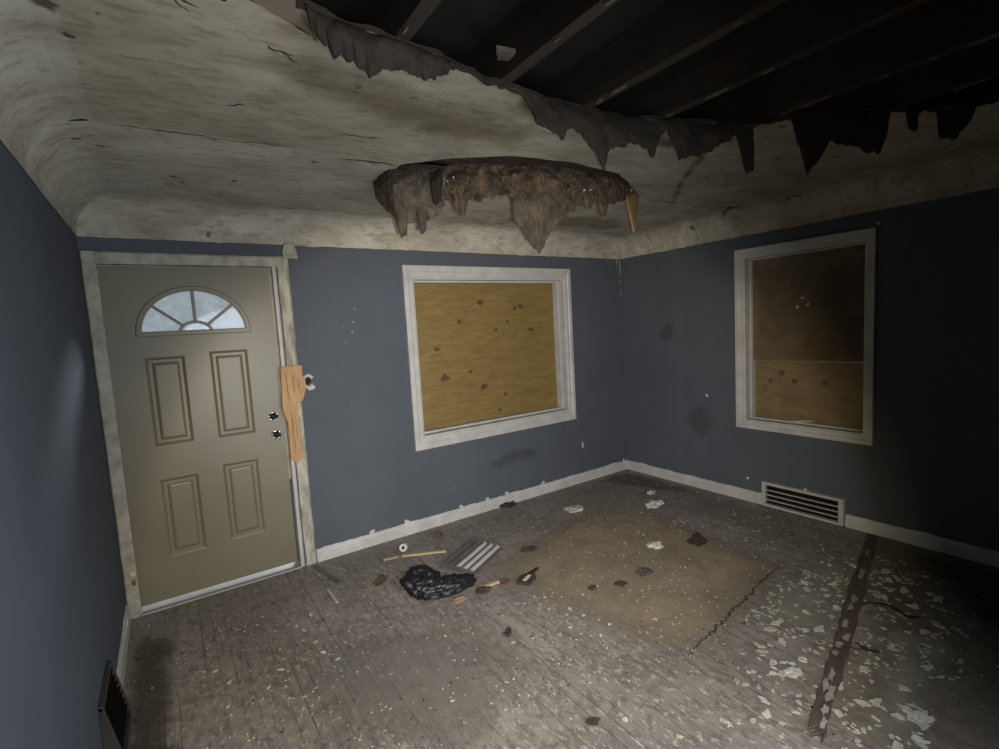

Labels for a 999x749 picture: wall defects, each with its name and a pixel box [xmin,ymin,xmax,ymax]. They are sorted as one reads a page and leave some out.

spalling [446,59,540,100]